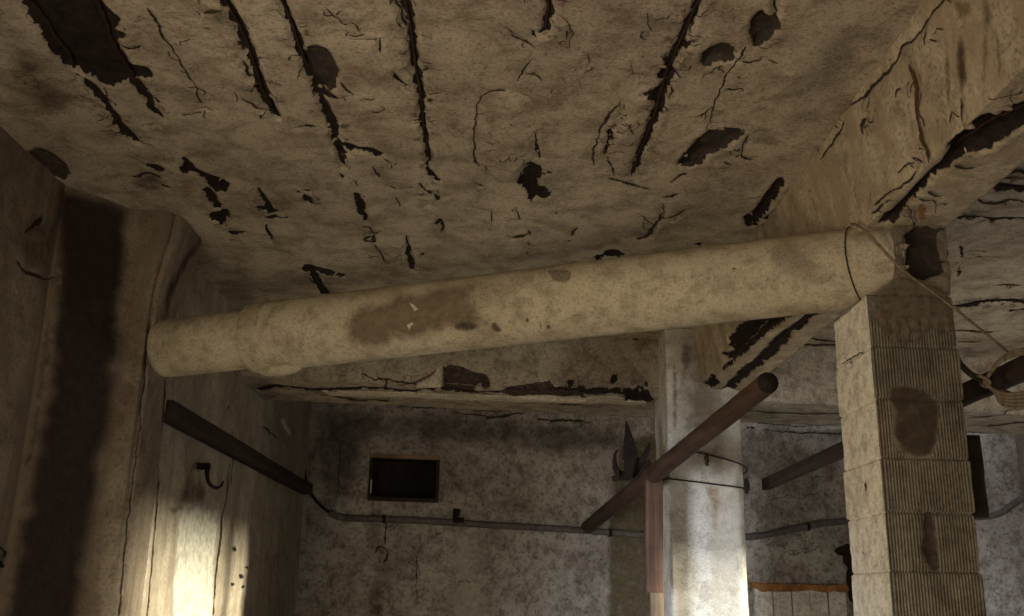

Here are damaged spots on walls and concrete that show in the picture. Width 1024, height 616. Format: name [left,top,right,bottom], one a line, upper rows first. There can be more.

spalling [22,0,169,148]
spalling [276,0,383,220]
spalling [389,0,441,200]
spalling [623,0,744,178]
crack [818,0,963,226]
spalling [878,101,1024,224]
crack [988,87,1023,103]
leakage [352,290,478,343]
flaking render [252,360,654,406]
crack [322,369,591,426]
spalling [704,313,821,388]
leakage [891,387,937,455]